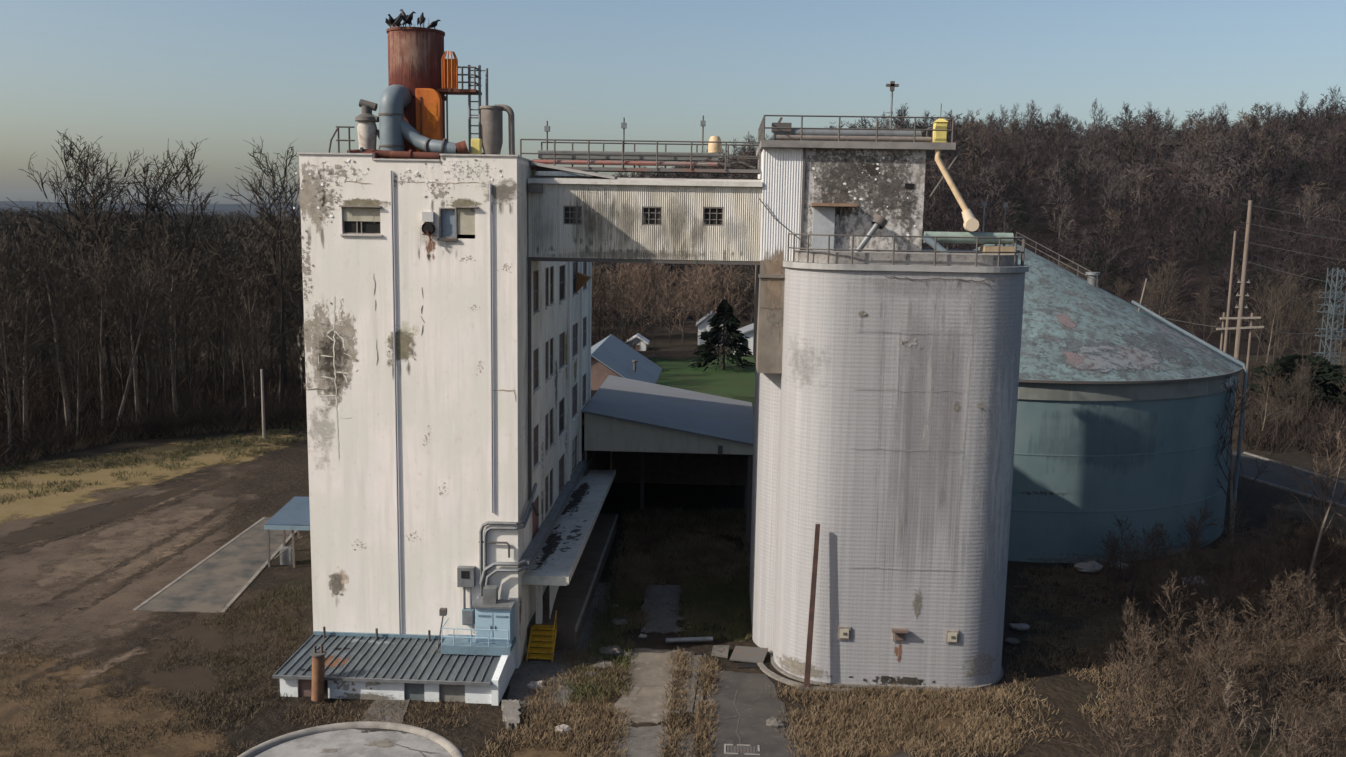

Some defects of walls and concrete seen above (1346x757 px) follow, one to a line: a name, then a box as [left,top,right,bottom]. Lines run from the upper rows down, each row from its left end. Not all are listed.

rust [388,24,436,92]
leakage [573,191,641,252]
leakage [662,204,704,262]
peeling [808,148,921,241]
peeling [293,159,369,414]
peeling [1035,313,1227,373]